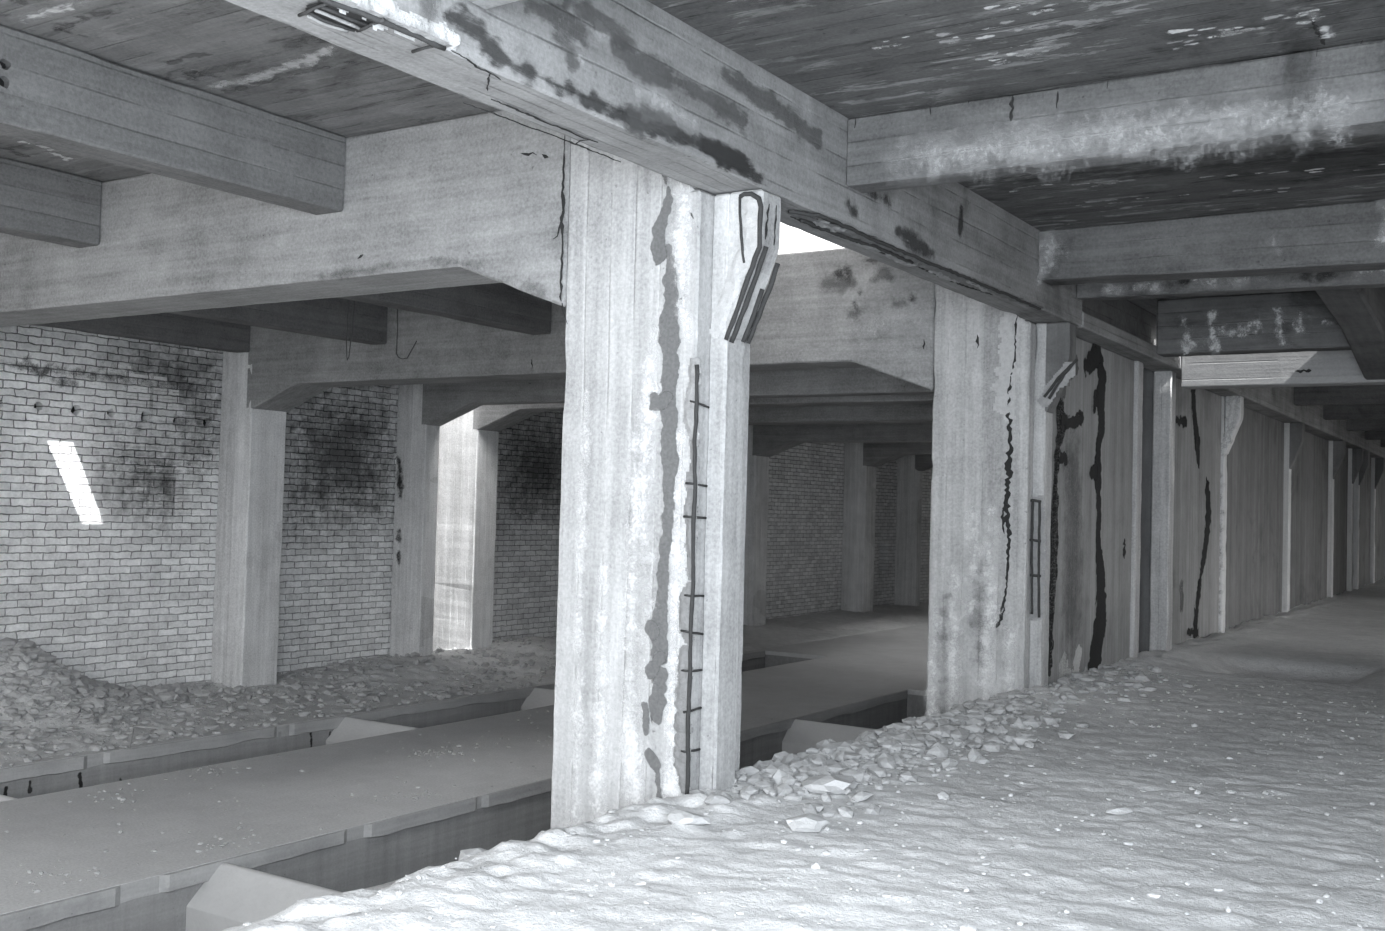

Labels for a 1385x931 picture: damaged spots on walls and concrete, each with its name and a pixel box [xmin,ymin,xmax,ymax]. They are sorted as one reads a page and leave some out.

spalling [297,0,461,53]
peeling [1169,27,1242,45]
crack [765,204,885,254]
spalling [709,192,780,344]
crack [916,264,992,295]
spalling [786,210,1044,423]
spalling [1037,358,1078,407]
crack [995,316,1018,628]
spalling [672,358,710,795]